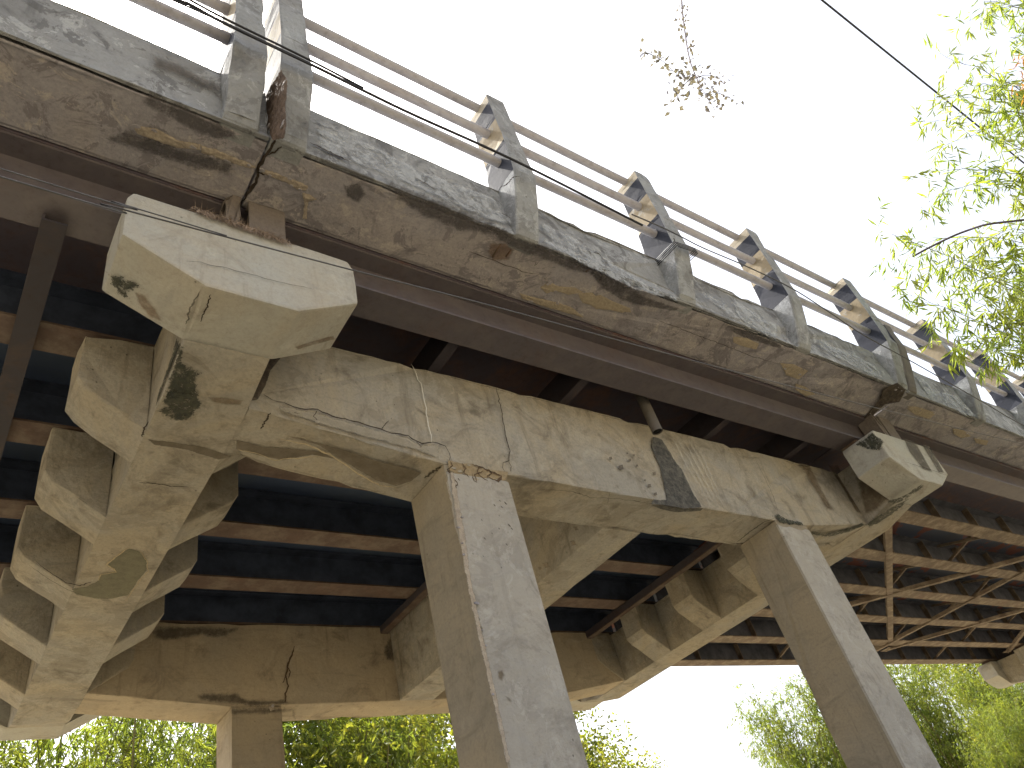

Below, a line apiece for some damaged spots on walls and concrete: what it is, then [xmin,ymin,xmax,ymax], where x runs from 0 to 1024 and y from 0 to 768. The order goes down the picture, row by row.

crack [243,140,282,201]
crack [186,293,211,323]
water stain [156,339,202,421]
crack [238,387,512,488]
spalling [280,407,510,762]
crack [283,646,295,702]